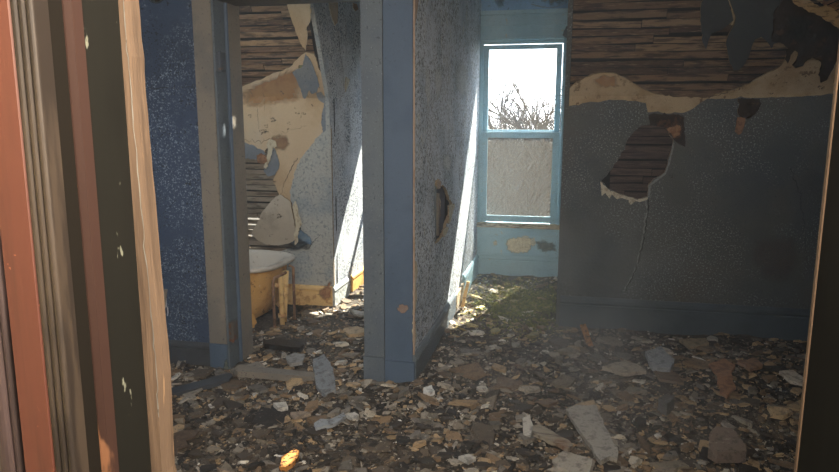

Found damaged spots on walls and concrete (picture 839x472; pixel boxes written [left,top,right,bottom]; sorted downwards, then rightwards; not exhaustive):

flaking render [562,0,839,114]
peeling [239,6,326,251]
flaking render [600,124,675,205]
hole [434,179,455,241]
peeling [493,236,536,253]